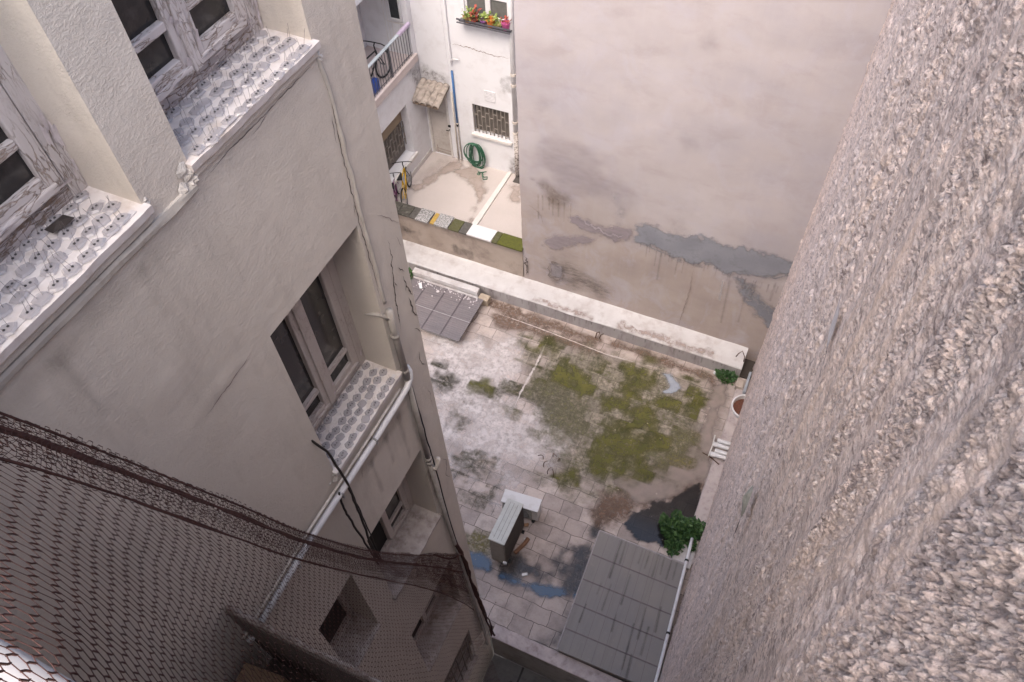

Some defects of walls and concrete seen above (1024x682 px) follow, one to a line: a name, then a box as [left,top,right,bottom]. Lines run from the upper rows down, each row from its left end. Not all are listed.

flaking render [176,161,199,195]
crack [327,89,422,363]
leakage [545,217,632,249]